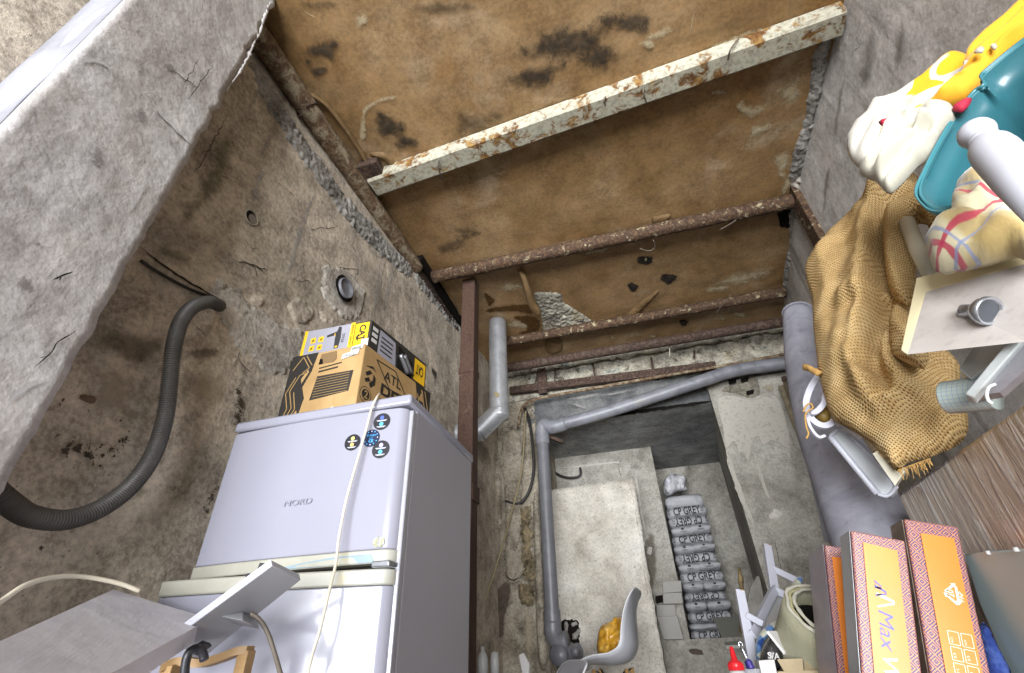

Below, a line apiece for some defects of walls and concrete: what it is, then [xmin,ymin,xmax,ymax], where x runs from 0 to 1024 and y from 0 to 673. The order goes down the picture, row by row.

crack [173,58,214,97]
mould [306,41,338,76]
water stain [509,14,666,87]
water stain [360,96,418,147]
crack [145,250,214,296]
spalling [508,267,783,383]
mould [55,422,133,469]